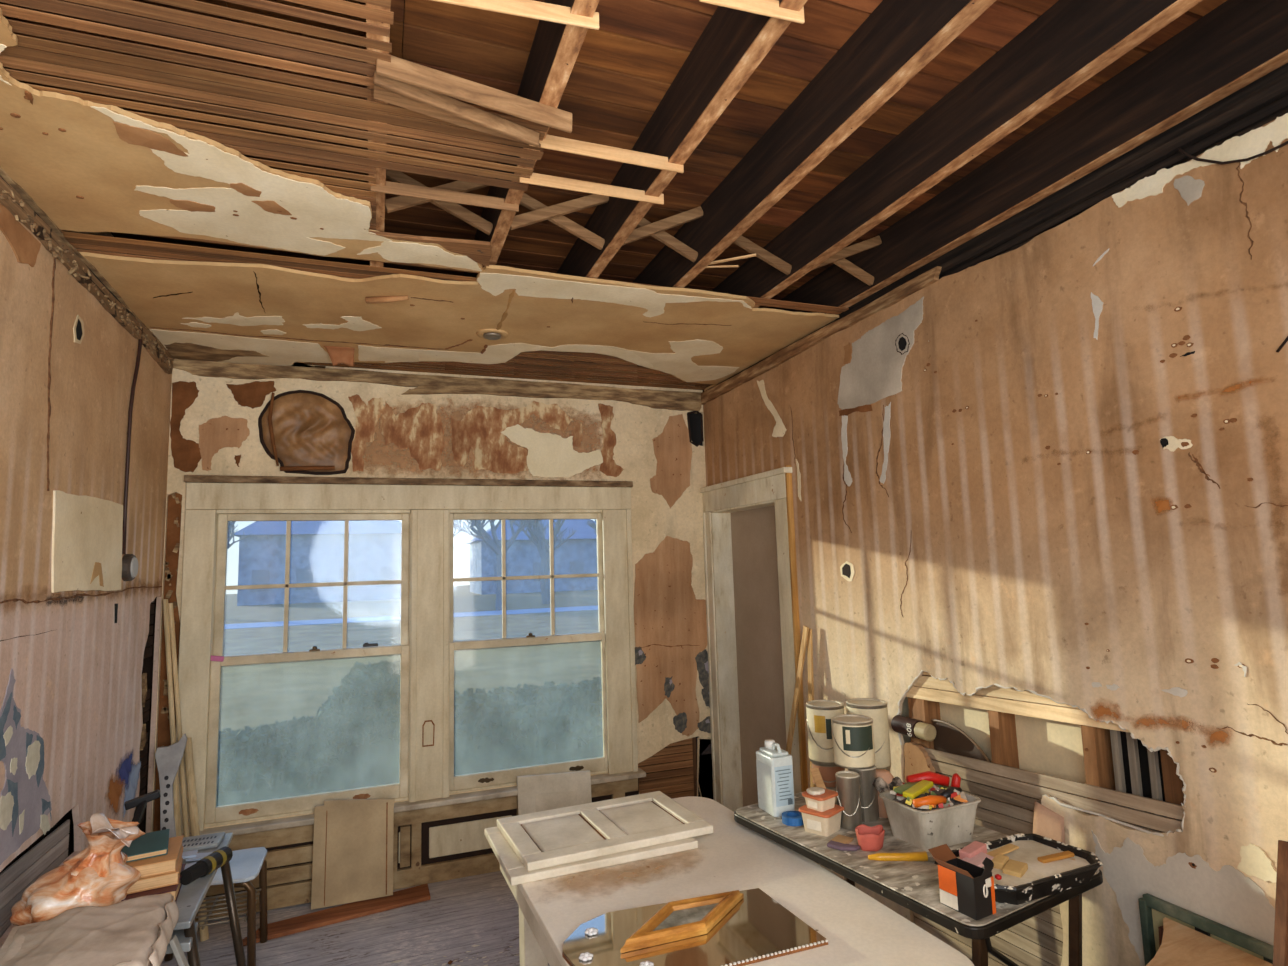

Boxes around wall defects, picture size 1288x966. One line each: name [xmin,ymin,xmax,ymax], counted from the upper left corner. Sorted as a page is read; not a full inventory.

peeling [1112,113,1288,208]
crack [1236,162,1254,259]
peeling [150,313,740,478]
flaking render [838,297,930,416]
spalling [1160,335,1195,363]
flaking render [650,411,704,509]
crack [0,586,162,641]
spalling [134,492,182,832]
flaking render [634,536,707,799]
crack [1217,704,1288,746]
spalling [896,670,1277,966]